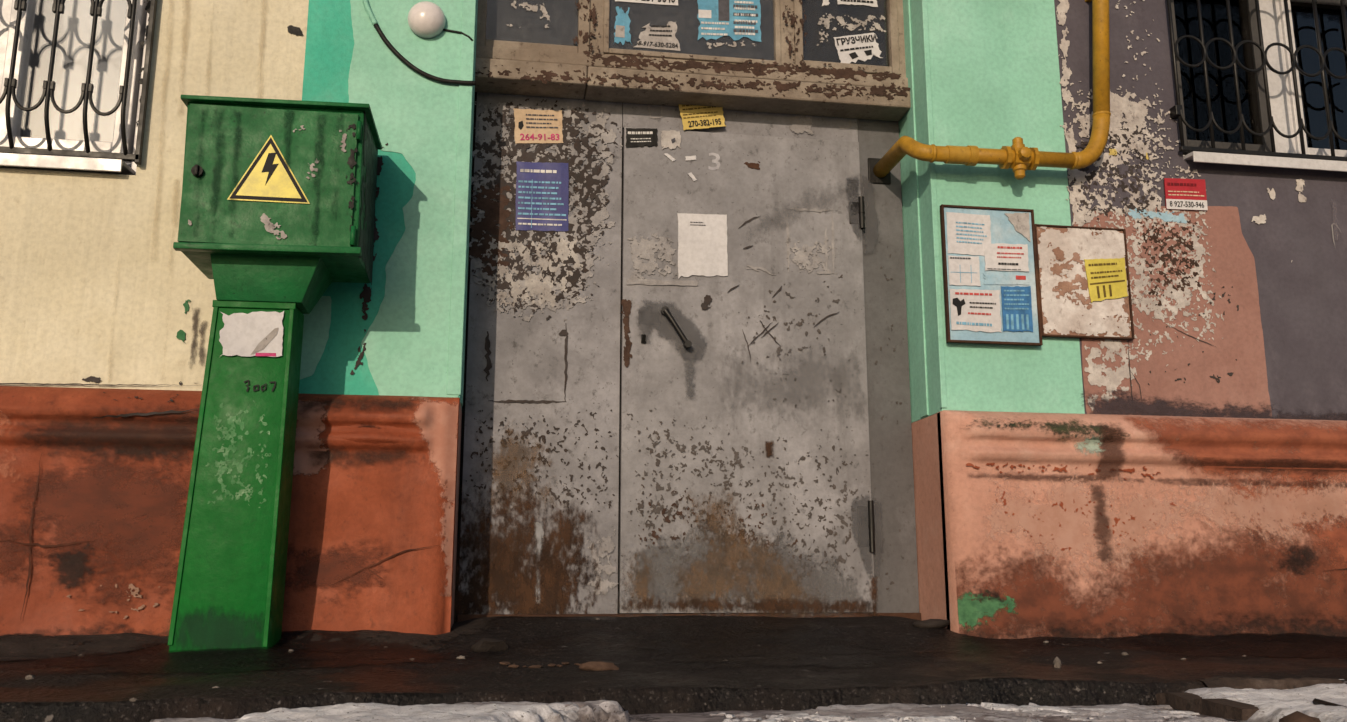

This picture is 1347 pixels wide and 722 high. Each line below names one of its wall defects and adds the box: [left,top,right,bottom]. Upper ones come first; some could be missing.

peeling [1056,0,1093,153]
peeling [469,0,910,322]
peeling [1066,0,1239,410]
peeling [620,299,632,367]
crack [0,454,92,620]
leakage [0,411,199,604]
leakage [40,609,456,674]
leakage [285,547,387,593]
corrosion [454,431,600,623]
corrosion [623,577,877,616]
leakage [956,390,1347,659]